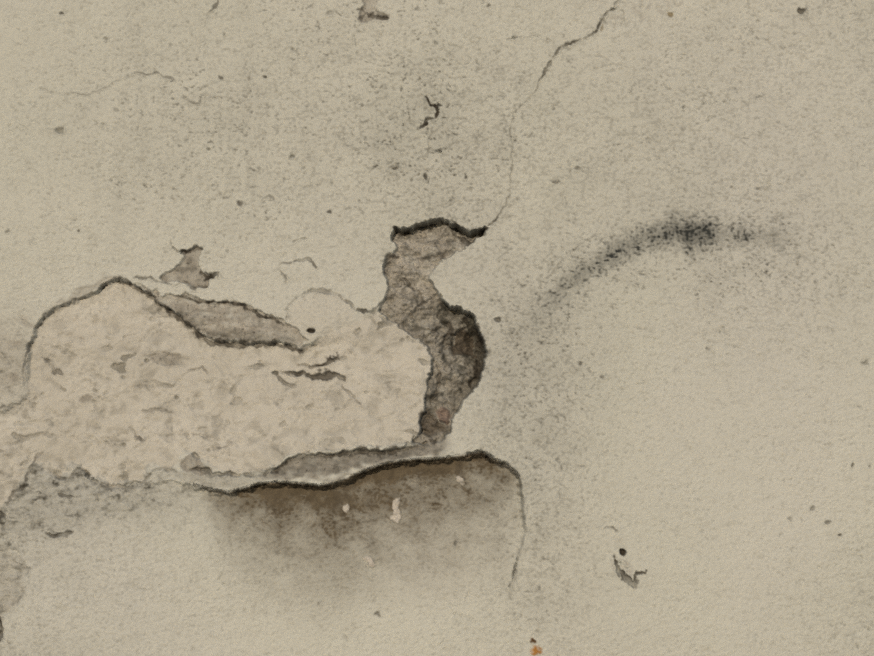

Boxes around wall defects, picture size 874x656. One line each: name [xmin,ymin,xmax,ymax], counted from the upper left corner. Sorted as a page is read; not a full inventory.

peeling [355,0,392,25]
crack [418,93,447,153]
crack [487,0,694,227]
flaking render [0,215,492,642]
peeling [609,548,649,590]